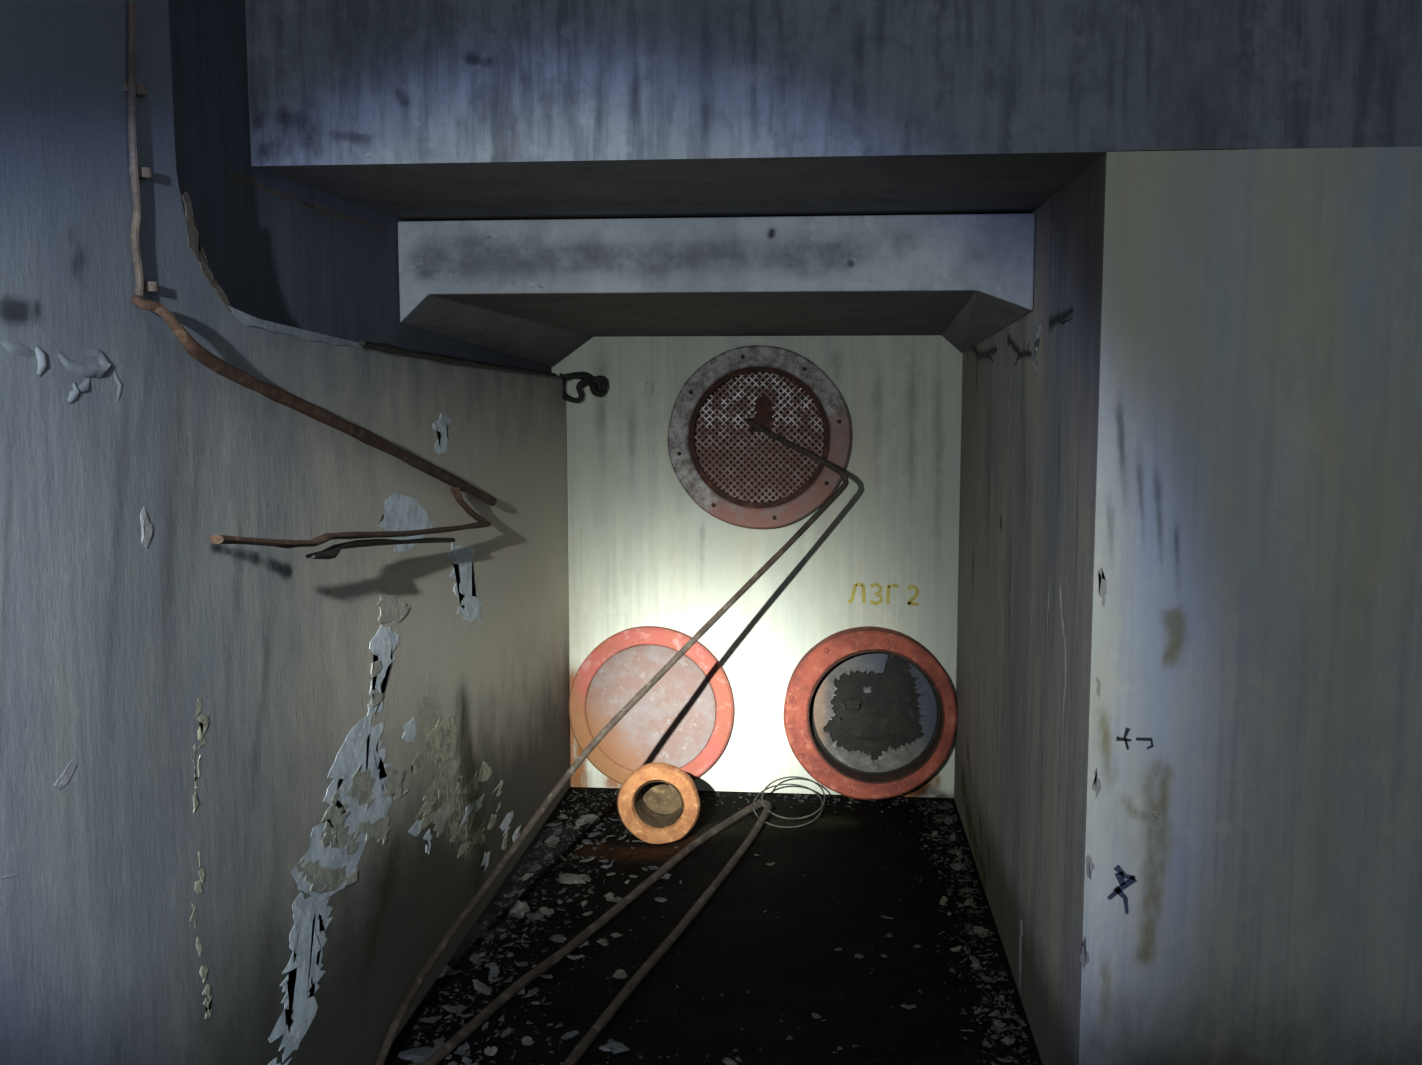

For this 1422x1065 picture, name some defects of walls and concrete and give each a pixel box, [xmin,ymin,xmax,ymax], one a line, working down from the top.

peeling [433,413,451,454]
peeling [378,493,434,552]
peeling [447,543,483,622]
peeling [268,595,521,1065]